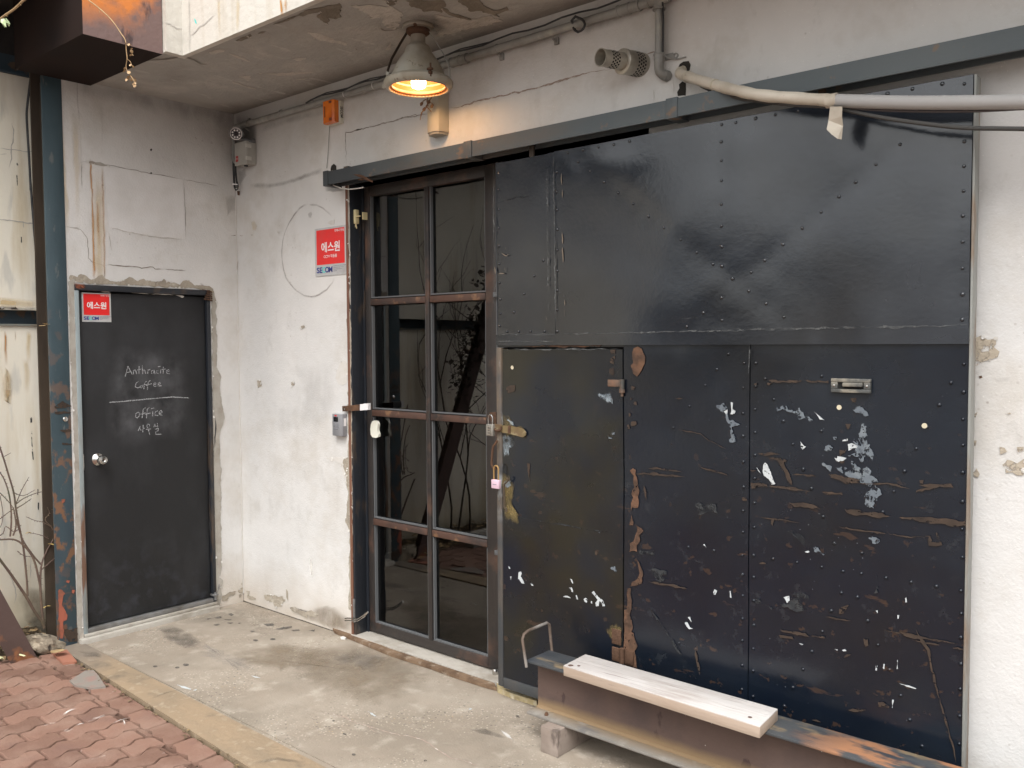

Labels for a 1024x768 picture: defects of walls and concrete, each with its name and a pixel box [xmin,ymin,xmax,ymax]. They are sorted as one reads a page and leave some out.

spalling [275,0,508,37]
spalling [976,335,1000,366]
rust [627,346,645,429]
spalling [54,274,318,642]
spalling [1000,447,1024,475]
rust [502,479,517,519]
rust [742,457,818,509]
rust [845,509,966,527]
rust [611,469,667,668]